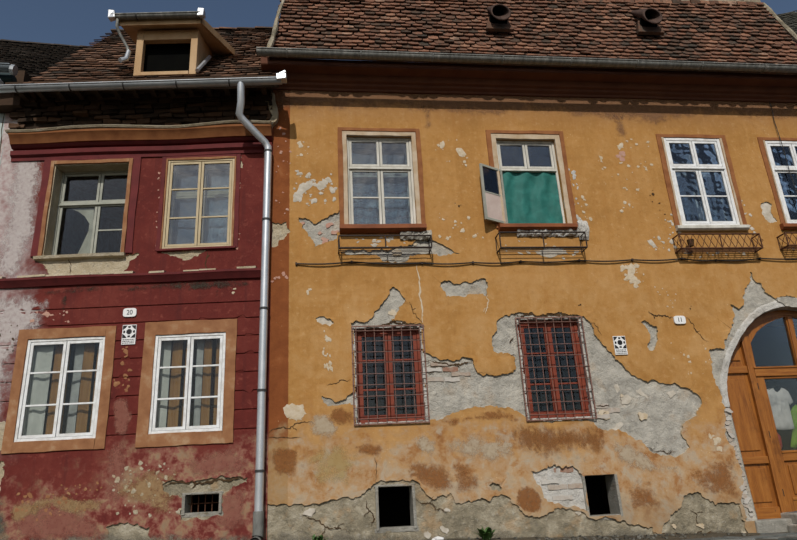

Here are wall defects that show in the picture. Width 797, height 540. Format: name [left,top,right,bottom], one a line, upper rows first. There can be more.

flaking render [5,88,340,247]
flaking render [351,287,421,327]
crack [382,265,423,325]
flaking render [424,304,701,457]
damp [114,399,131,433]
peeling [283,403,306,421]
damp [313,409,352,434]
damp [273,449,296,474]
damp [359,445,381,454]
damp [411,465,449,489]
flaking render [267,407,757,540]
flaking render [106,461,247,540]